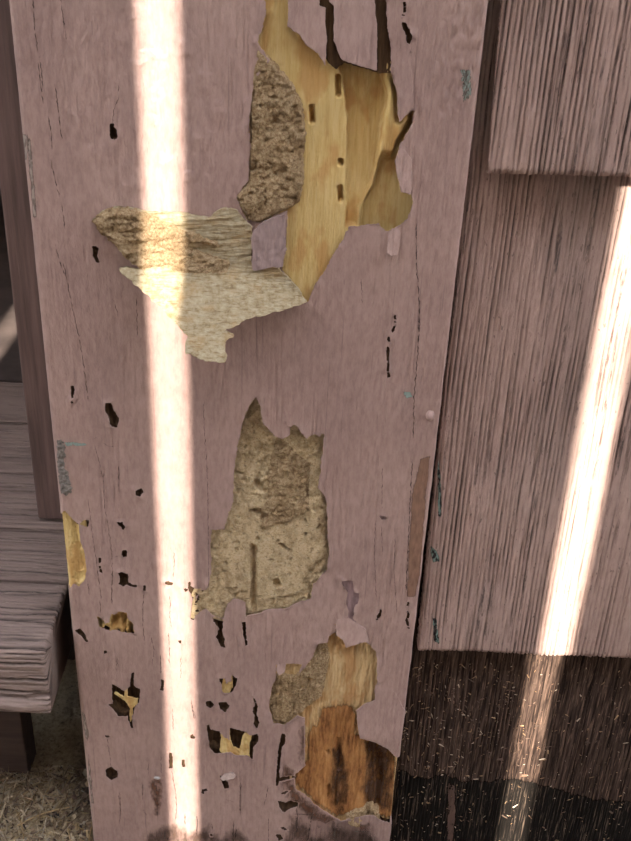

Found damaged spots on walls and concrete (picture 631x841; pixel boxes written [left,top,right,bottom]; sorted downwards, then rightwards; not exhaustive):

spalling [237,0,414,302]
peeling [62,511,87,588]
peeling [97,611,135,633]
spalling [191,398,330,621]
spalling [269,580,406,827]